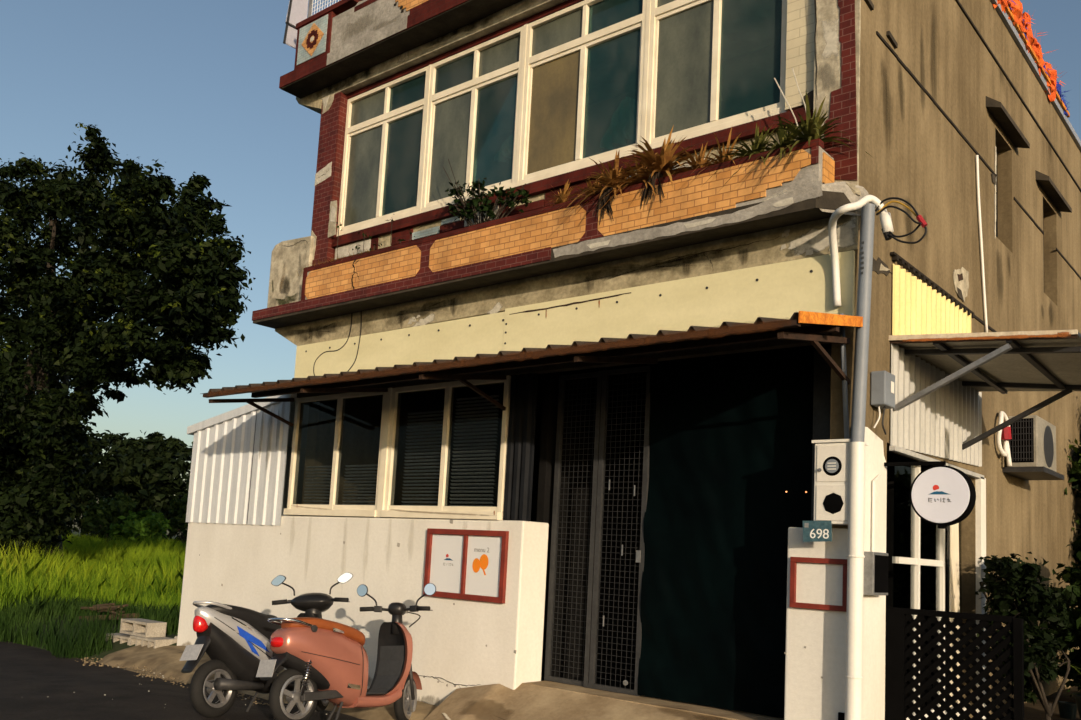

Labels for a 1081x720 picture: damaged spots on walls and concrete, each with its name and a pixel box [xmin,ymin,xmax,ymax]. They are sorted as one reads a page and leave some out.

peeling [330,0,407,52]
peeling [804,0,840,139]
spalling [553,169,869,258]